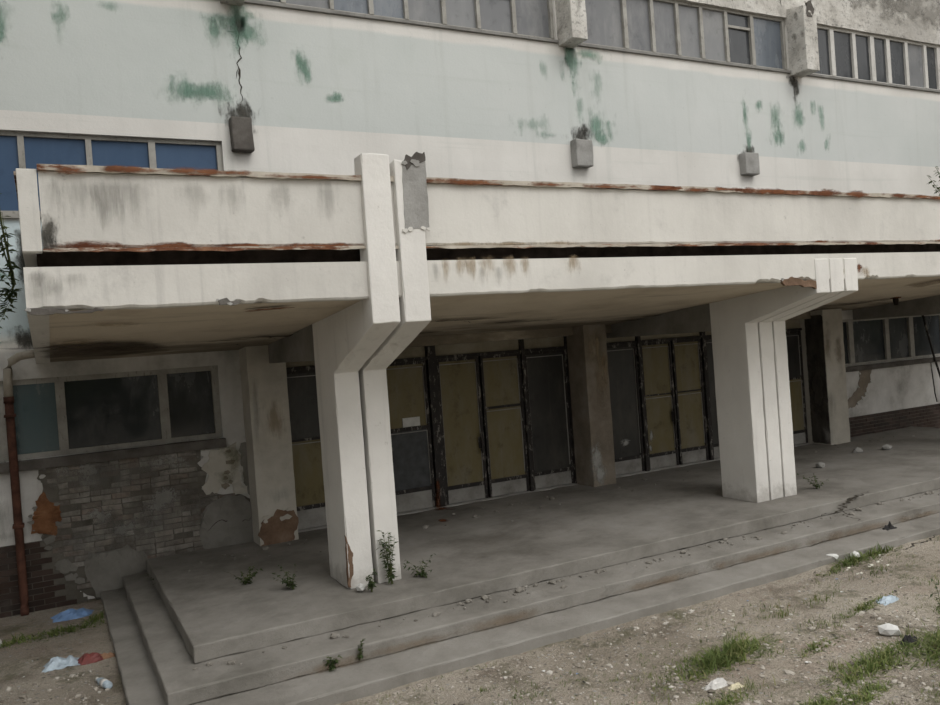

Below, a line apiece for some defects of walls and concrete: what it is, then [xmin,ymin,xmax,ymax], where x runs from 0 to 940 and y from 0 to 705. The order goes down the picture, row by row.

crack [235,5,243,105]
corrosion [57,166,84,174]
corrosion [104,165,155,173]
corrosion [656,186,786,194]
corrosion [811,189,867,198]
damp [45,342,162,358]
spalling [848,369,873,408]
spalling [27,442,250,600]
spalling [258,508,299,546]